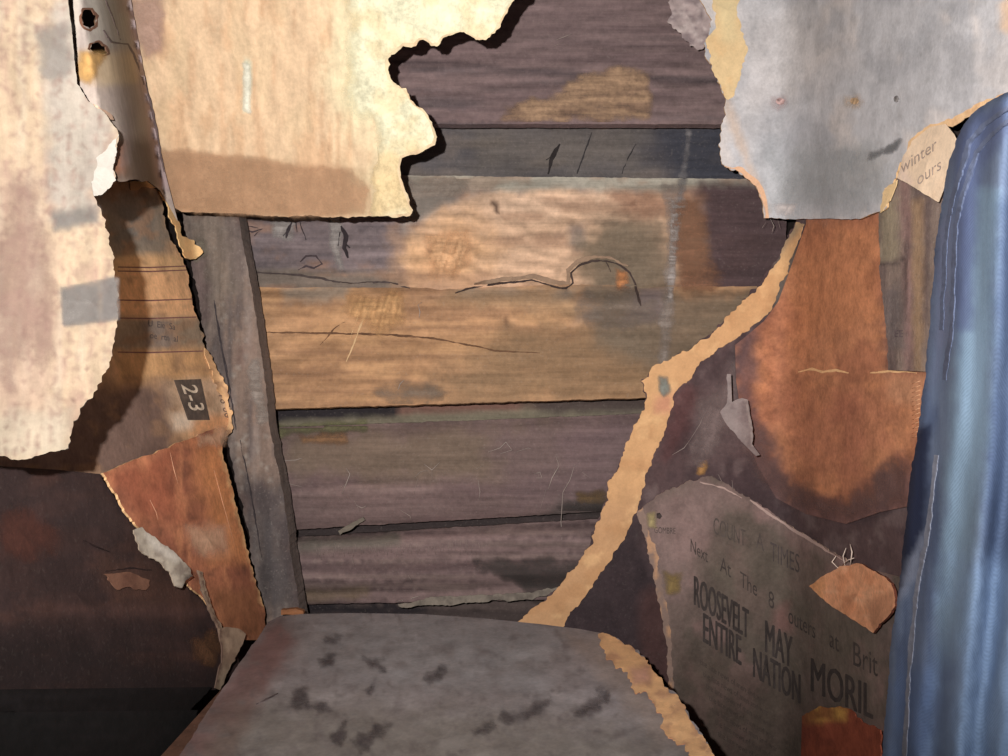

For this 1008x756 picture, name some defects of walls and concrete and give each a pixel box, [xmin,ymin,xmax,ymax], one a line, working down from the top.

peeling [346,0,512,216]
crack [546,144,561,174]
crack [577,132,592,174]
crack [455,259,641,306]
crack [270,322,538,353]